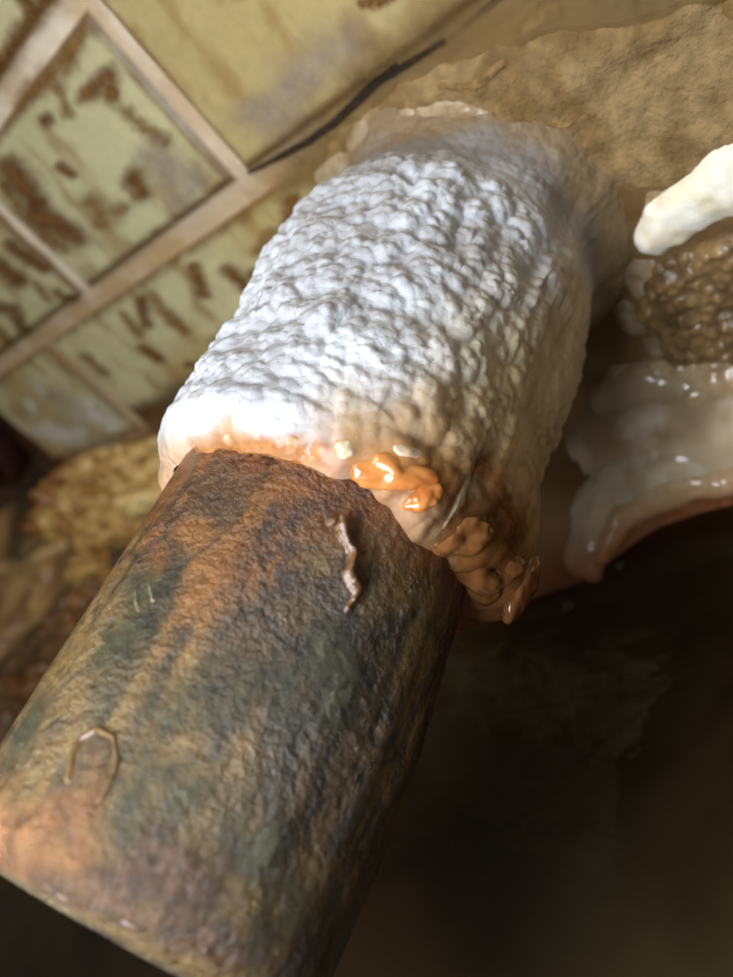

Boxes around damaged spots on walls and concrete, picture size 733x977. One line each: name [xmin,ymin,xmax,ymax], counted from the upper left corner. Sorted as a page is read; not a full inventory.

rust [198,439,325,463]
water stain [0,0,733,775]
rust [343,437,541,624]
water stain [230,828,296,948]